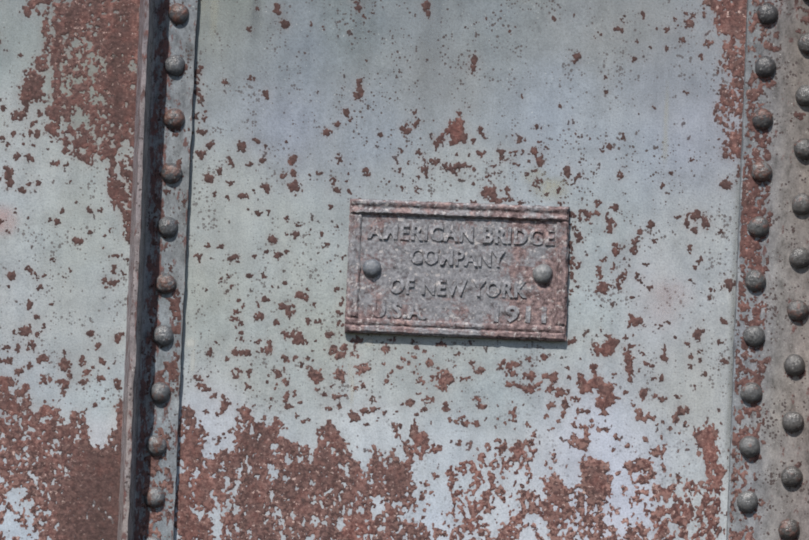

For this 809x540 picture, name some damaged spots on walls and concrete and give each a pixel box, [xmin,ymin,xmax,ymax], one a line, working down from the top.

rust [0,0,140,244]
rust [790,0,809,37]
rust [6,265,47,291]
rust [101,247,129,299]
rust [140,0,782,540]
rust [0,299,123,540]